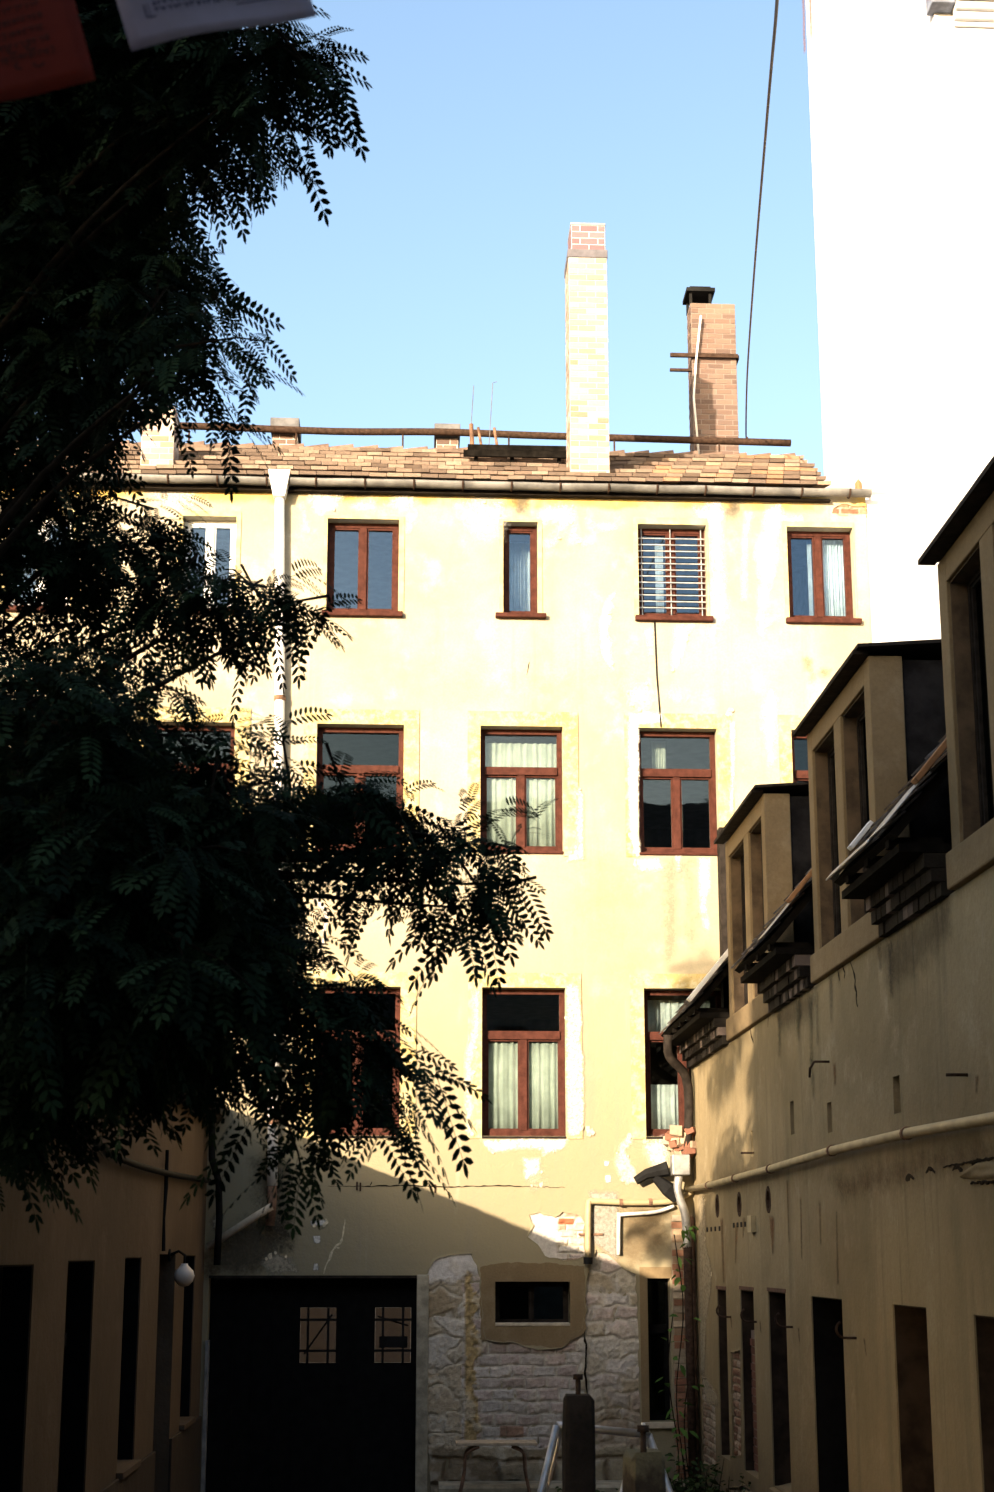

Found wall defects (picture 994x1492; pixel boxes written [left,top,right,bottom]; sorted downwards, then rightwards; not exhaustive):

flaking render [628,713,680,871]
flaking render [698,858,710,929]
flaking render [464,984,595,1187]
crack [330,1182,565,1191]
flaking render [604,1133,665,1184]
crack [323,1223,345,1274]
flaking render [425,1210,642,1492]